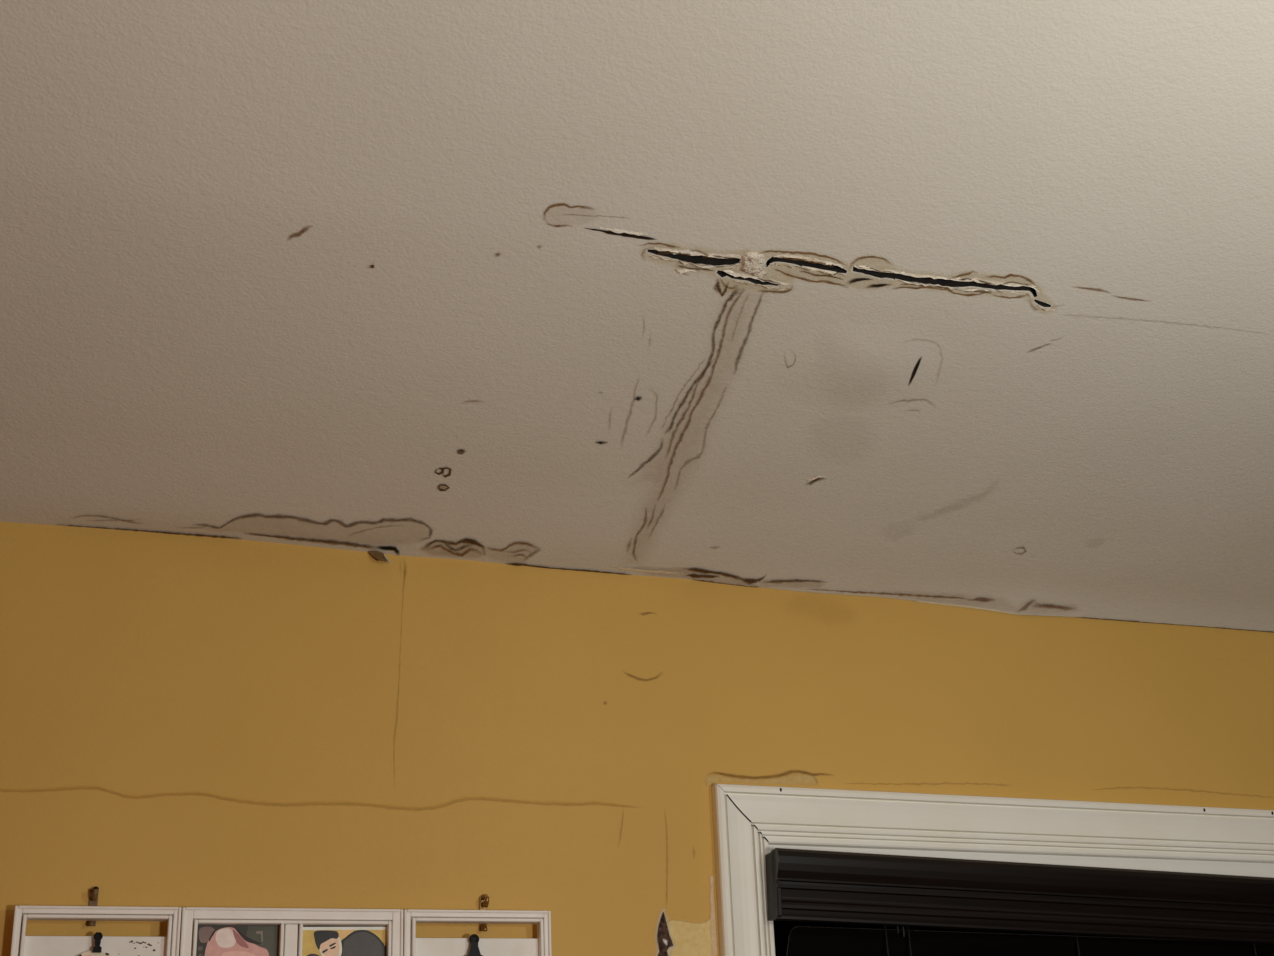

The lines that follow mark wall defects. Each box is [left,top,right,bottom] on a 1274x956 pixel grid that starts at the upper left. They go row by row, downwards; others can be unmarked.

water stain [737,251,843,364]
crack [587,227,1055,311]
water stain [899,273,1033,299]
crack [1080,287,1144,301]
water stain [632,243,742,494]
spalling [656,910,674,956]